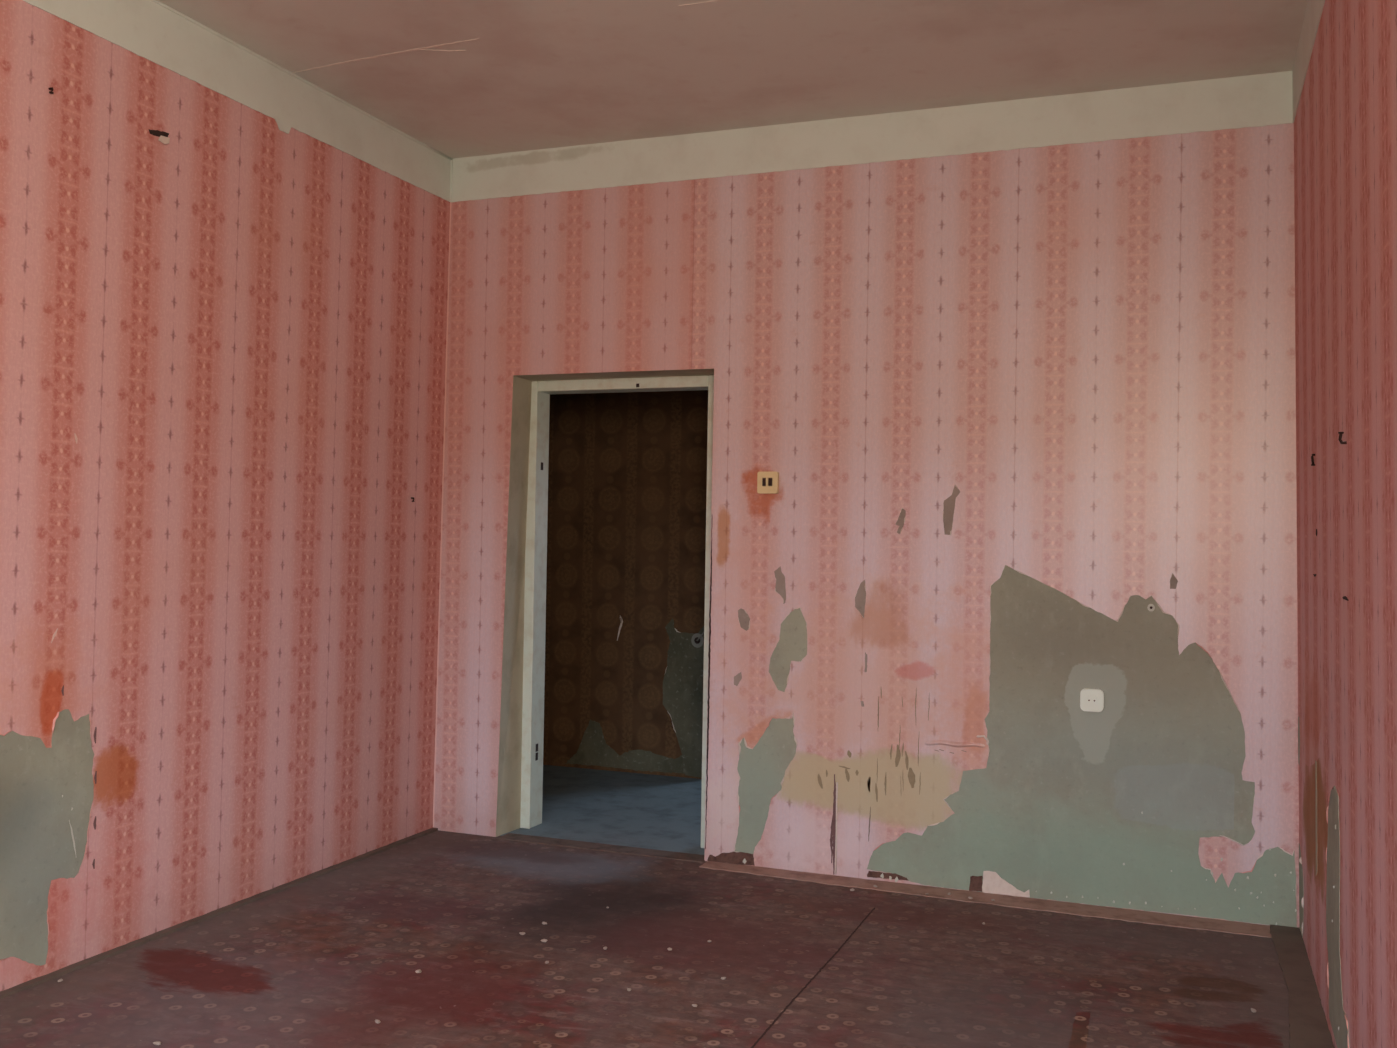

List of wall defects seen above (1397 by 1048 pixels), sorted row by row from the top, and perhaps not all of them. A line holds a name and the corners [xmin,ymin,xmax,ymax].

flaking render [0,685,97,966]
flaking render [565,618,704,778]
flaking render [707,714,798,866]
flaking render [769,599,807,692]
flaking render [867,565,1304,938]
water stain [1299,657,1333,927]
flaking render [1326,786,1350,1048]